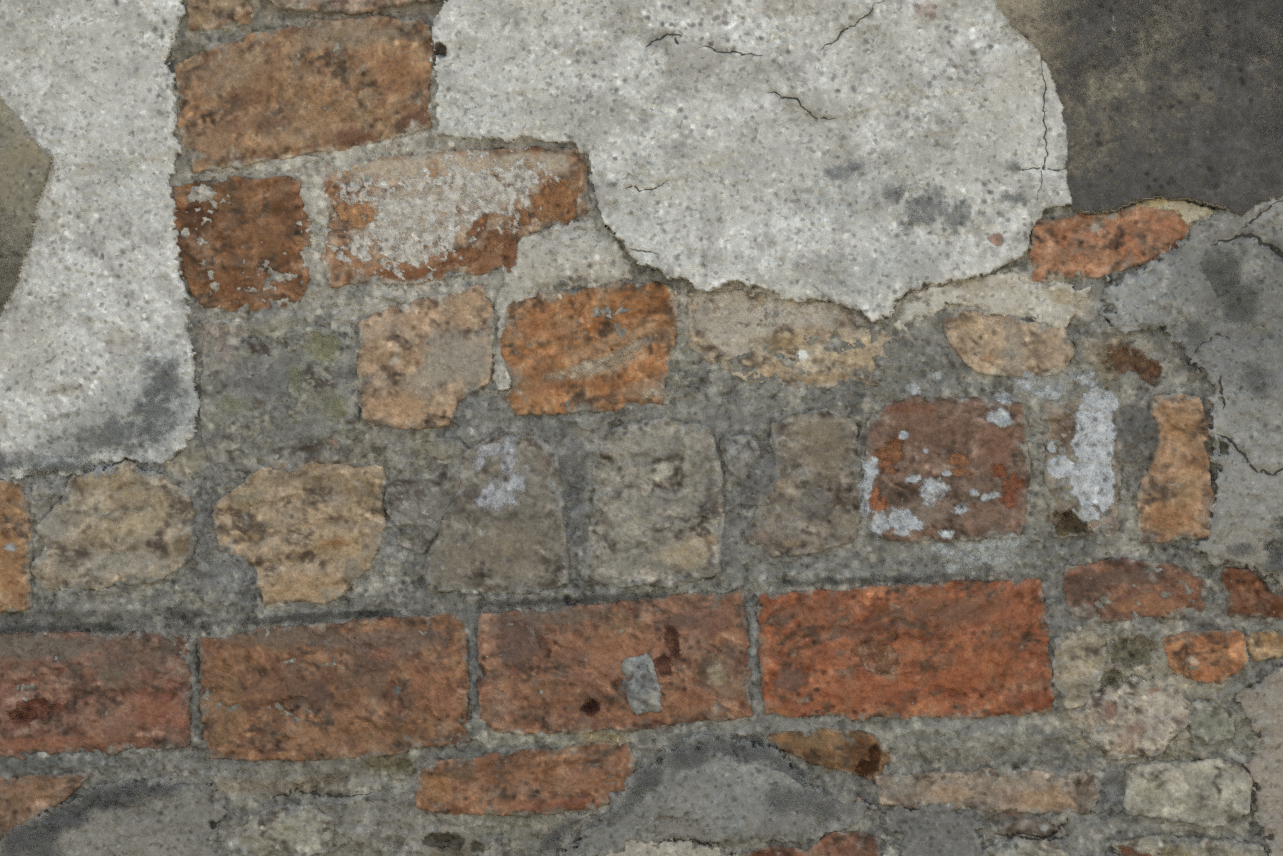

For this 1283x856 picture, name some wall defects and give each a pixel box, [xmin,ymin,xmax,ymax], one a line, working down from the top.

spalling [434,39,451,56]
crack [646,33,763,56]
crack [821,1,883,50]
crack [767,91,837,120]
water stain [1050,0,1283,216]
flaking render [158,0,191,301]
spalling [331,150,579,273]
flaking render [637,255,901,321]
water stain [906,371,943,395]
water stain [986,371,1098,427]
flaking render [1204,382,1229,538]
water stain [856,457,1027,574]